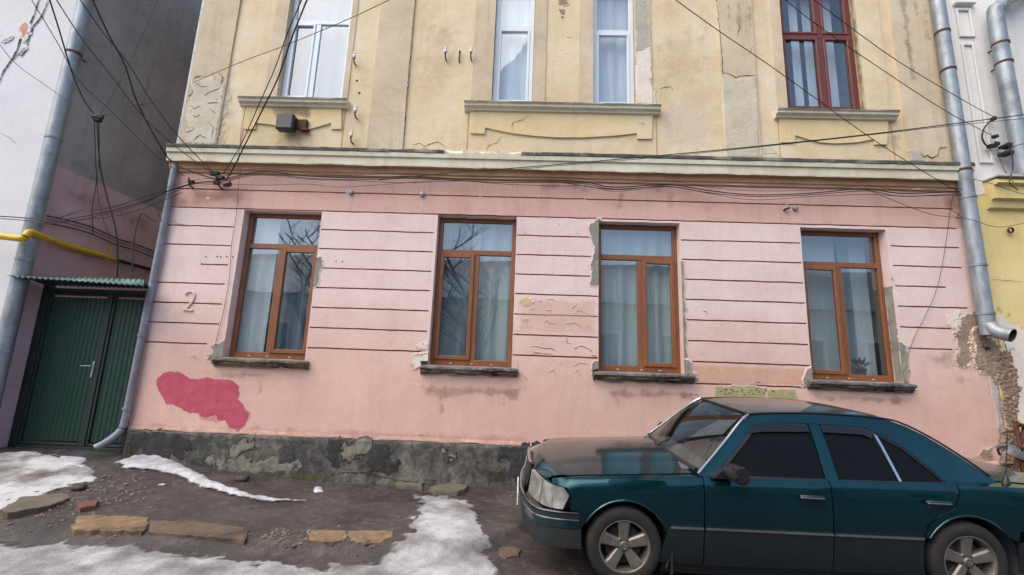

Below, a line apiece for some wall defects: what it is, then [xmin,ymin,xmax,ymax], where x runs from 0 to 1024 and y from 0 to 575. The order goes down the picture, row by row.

peeling [635,46,657,104]
peeling [181,69,232,145]
flaking render [945,305,1024,469]
peeling [127,428,197,460]
peeling [205,433,302,479]
peeling [325,436,401,477]